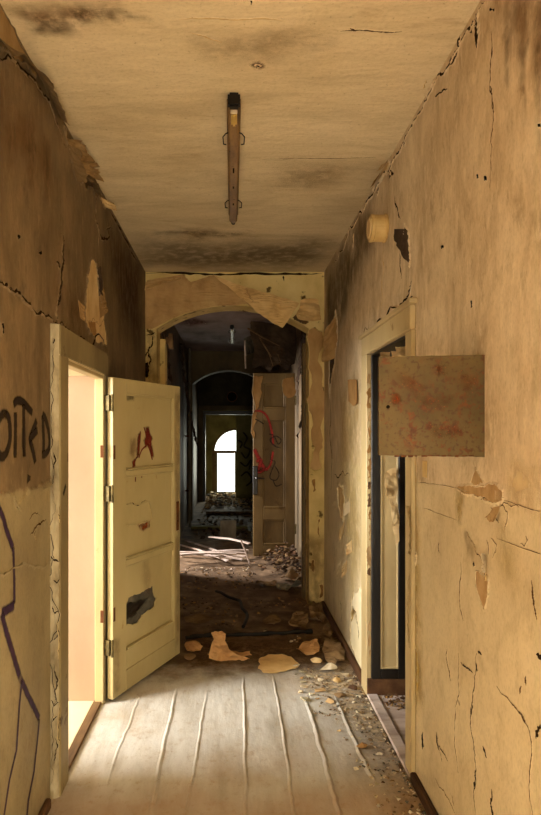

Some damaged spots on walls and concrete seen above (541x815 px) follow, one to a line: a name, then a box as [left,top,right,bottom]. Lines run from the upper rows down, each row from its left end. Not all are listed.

water stain [24,9,88,24]
crack [94,1,495,281]
flaking render [78,257,108,347]
peeling [306,327,324,492]
crack [0,232,107,786]
flaking render [467,532,498,611]
flaking render [456,481,519,533]
crack [435,650,495,815]
crack [497,676,541,815]